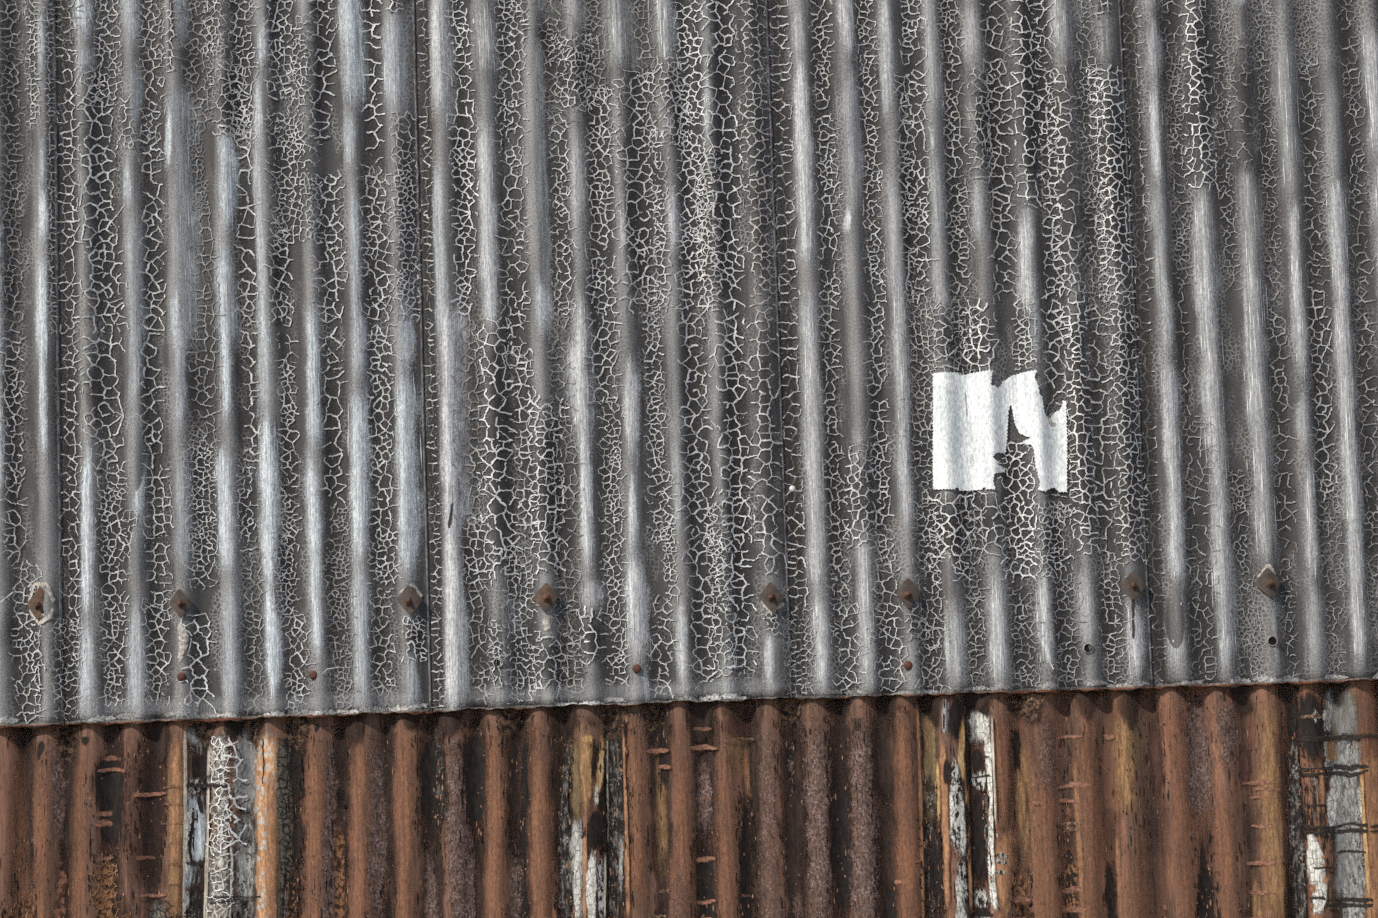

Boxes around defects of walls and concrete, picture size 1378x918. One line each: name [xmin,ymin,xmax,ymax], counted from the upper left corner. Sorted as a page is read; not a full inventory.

crack [0,0,1378,724]
peeling [0,704,536,918]
peeling [553,697,641,918]
peeling [699,693,759,702]
corrosion [255,690,1337,918]
peeling [799,672,1378,918]
corrosion [1357,700,1378,918]